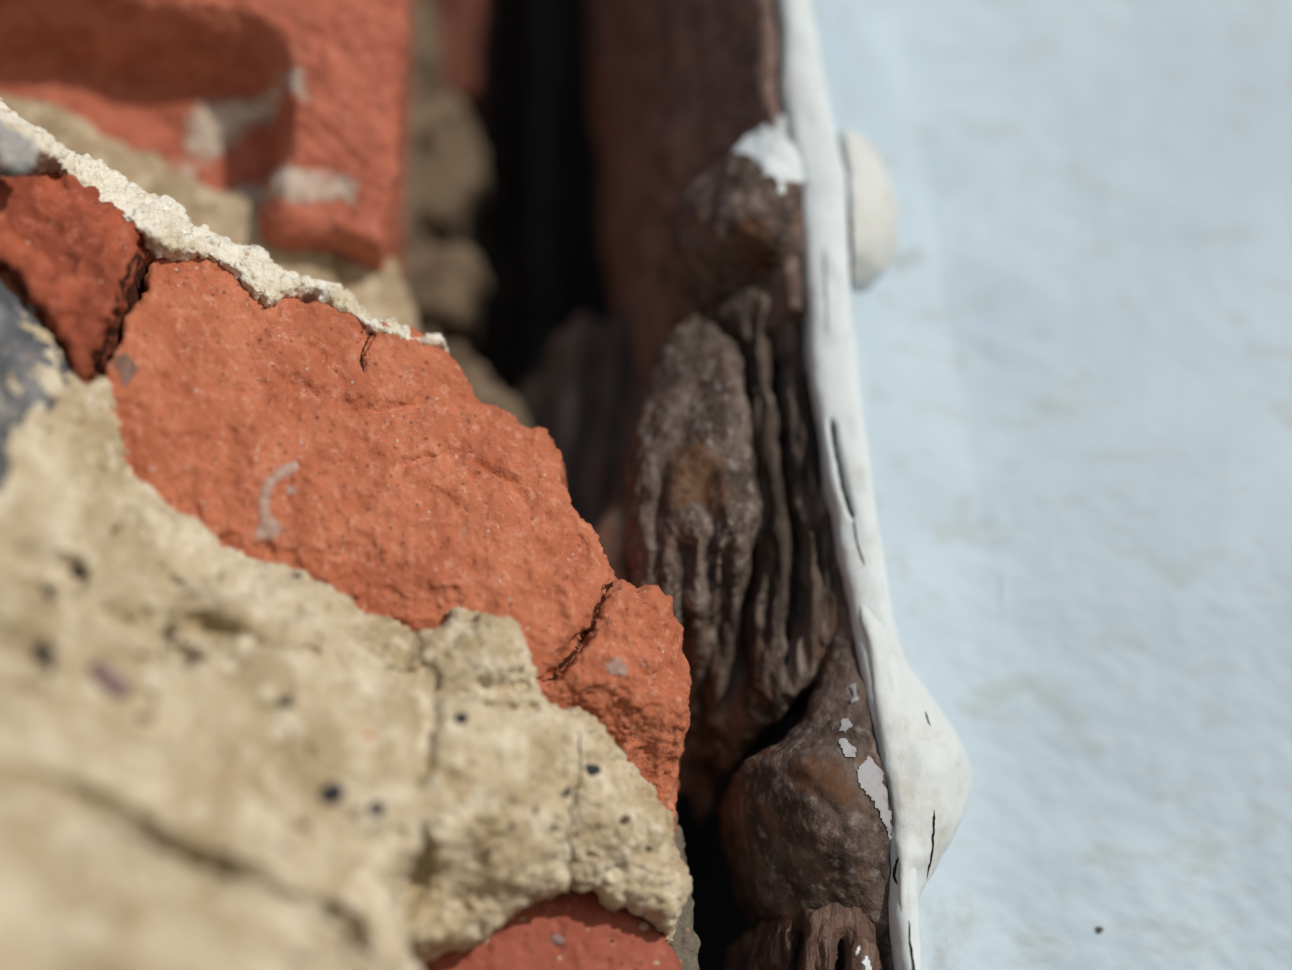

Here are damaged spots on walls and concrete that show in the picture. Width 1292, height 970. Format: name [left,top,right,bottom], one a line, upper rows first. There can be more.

crack [92,250,154,378]
crack [542,581,614,682]
peeling [839,682,893,840]